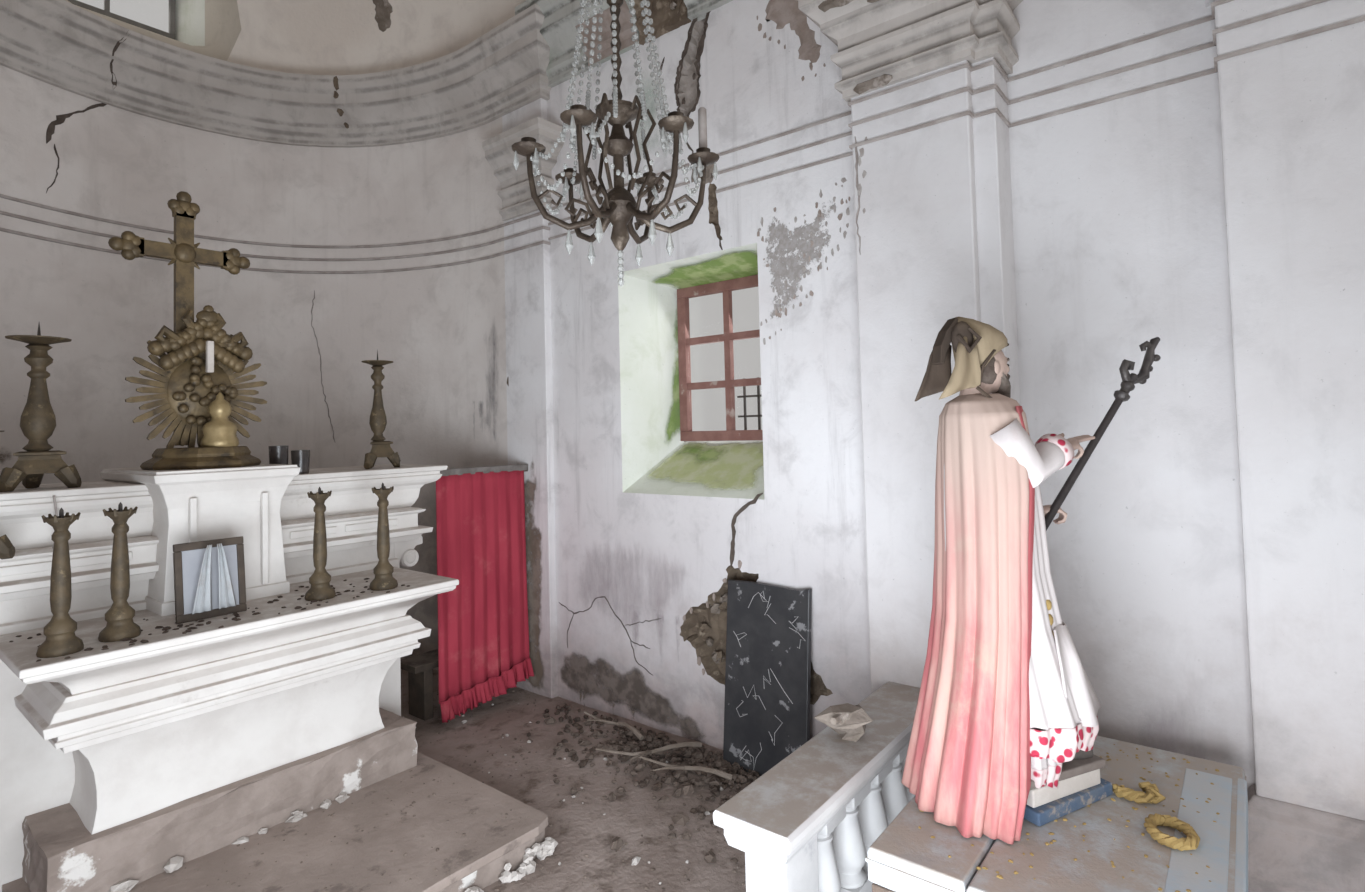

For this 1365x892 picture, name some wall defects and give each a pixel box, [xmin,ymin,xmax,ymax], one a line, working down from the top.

spalling [372,0,393,32]
spalling [756,0,879,81]
crack [46,33,131,193]
peeling [757,137,868,345]
crack [730,493,763,566]
water stain [524,463,544,688]
crack [559,596,662,675]
spalling [680,560,759,685]
water stain [561,654,701,741]